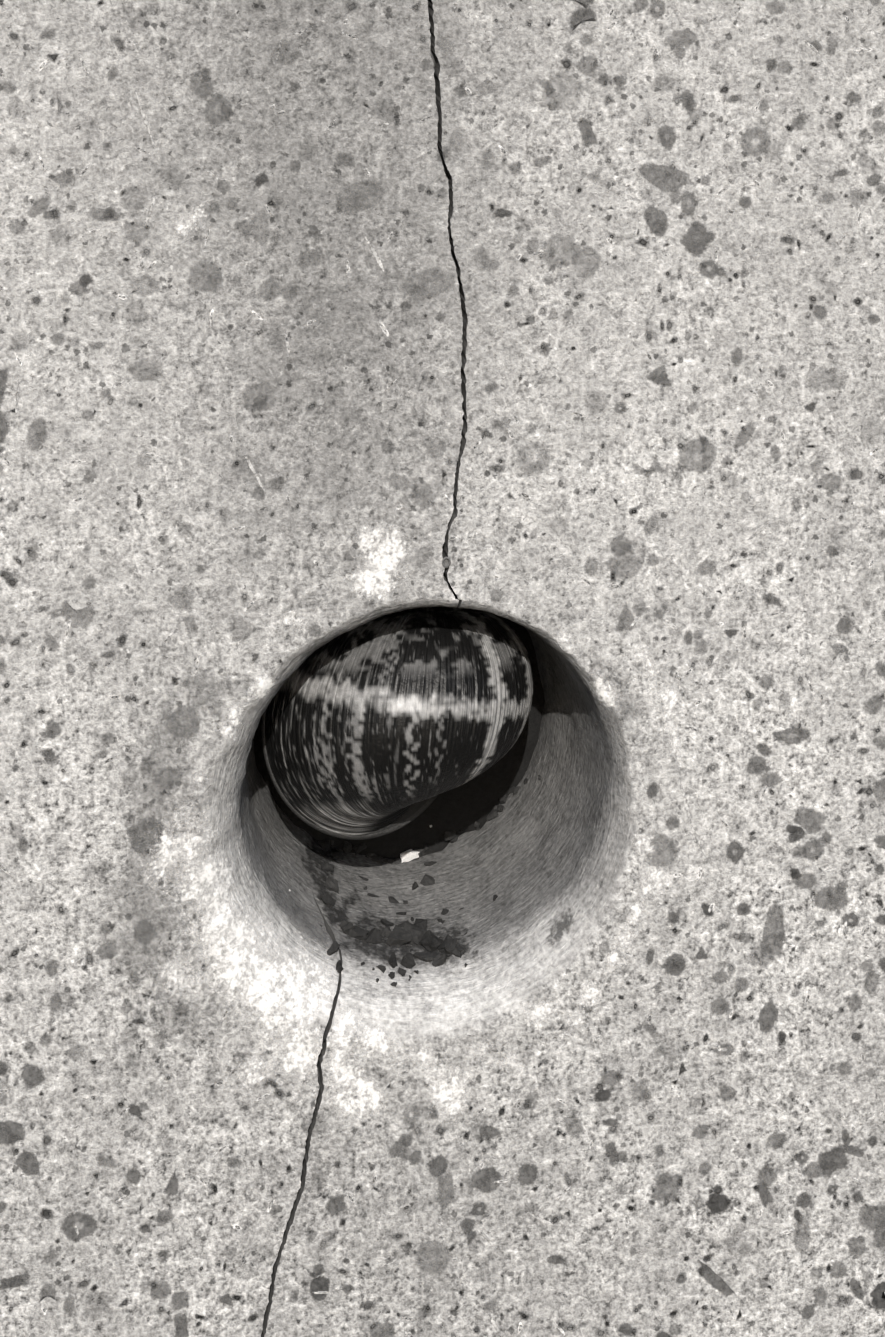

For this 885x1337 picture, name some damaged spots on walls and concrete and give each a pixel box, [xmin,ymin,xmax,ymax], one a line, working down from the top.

crack [428,0,468,608]
crack [261,894,342,1337]